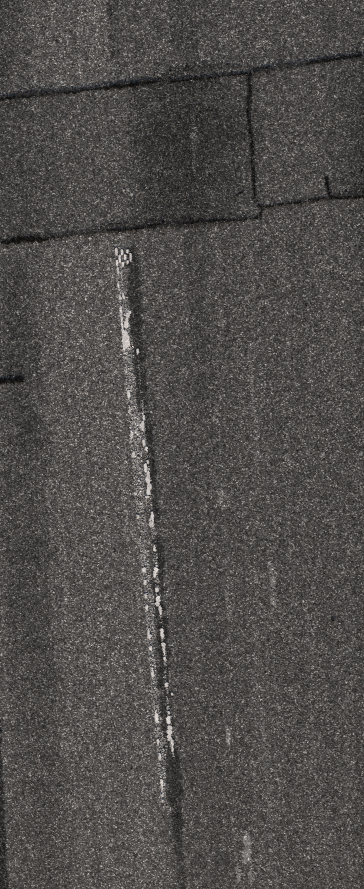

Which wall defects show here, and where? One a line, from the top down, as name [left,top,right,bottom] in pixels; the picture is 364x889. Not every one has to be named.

crack [0,50,364,247]
crack [0,376,24,385]
damp [127,246,161,523]
damp [152,538,186,889]